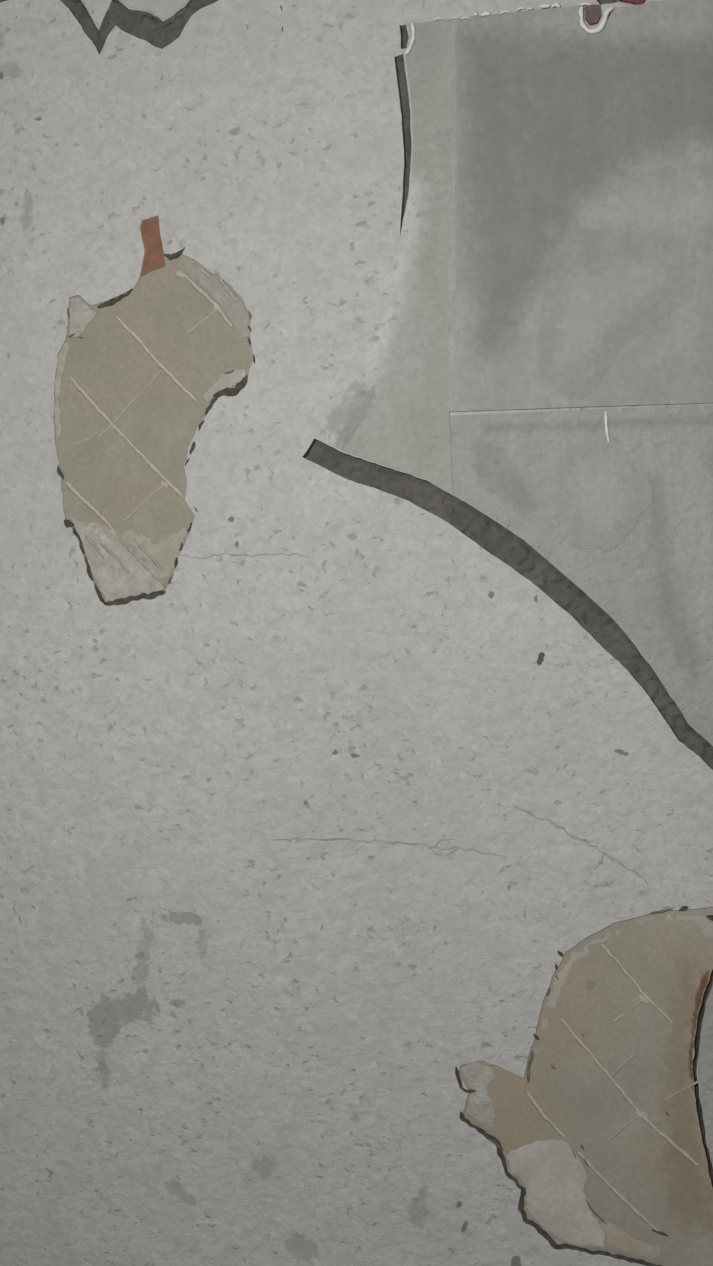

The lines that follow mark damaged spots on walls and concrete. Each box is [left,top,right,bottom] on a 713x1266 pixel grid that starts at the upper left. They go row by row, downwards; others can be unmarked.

spalling [54,216,255,606]